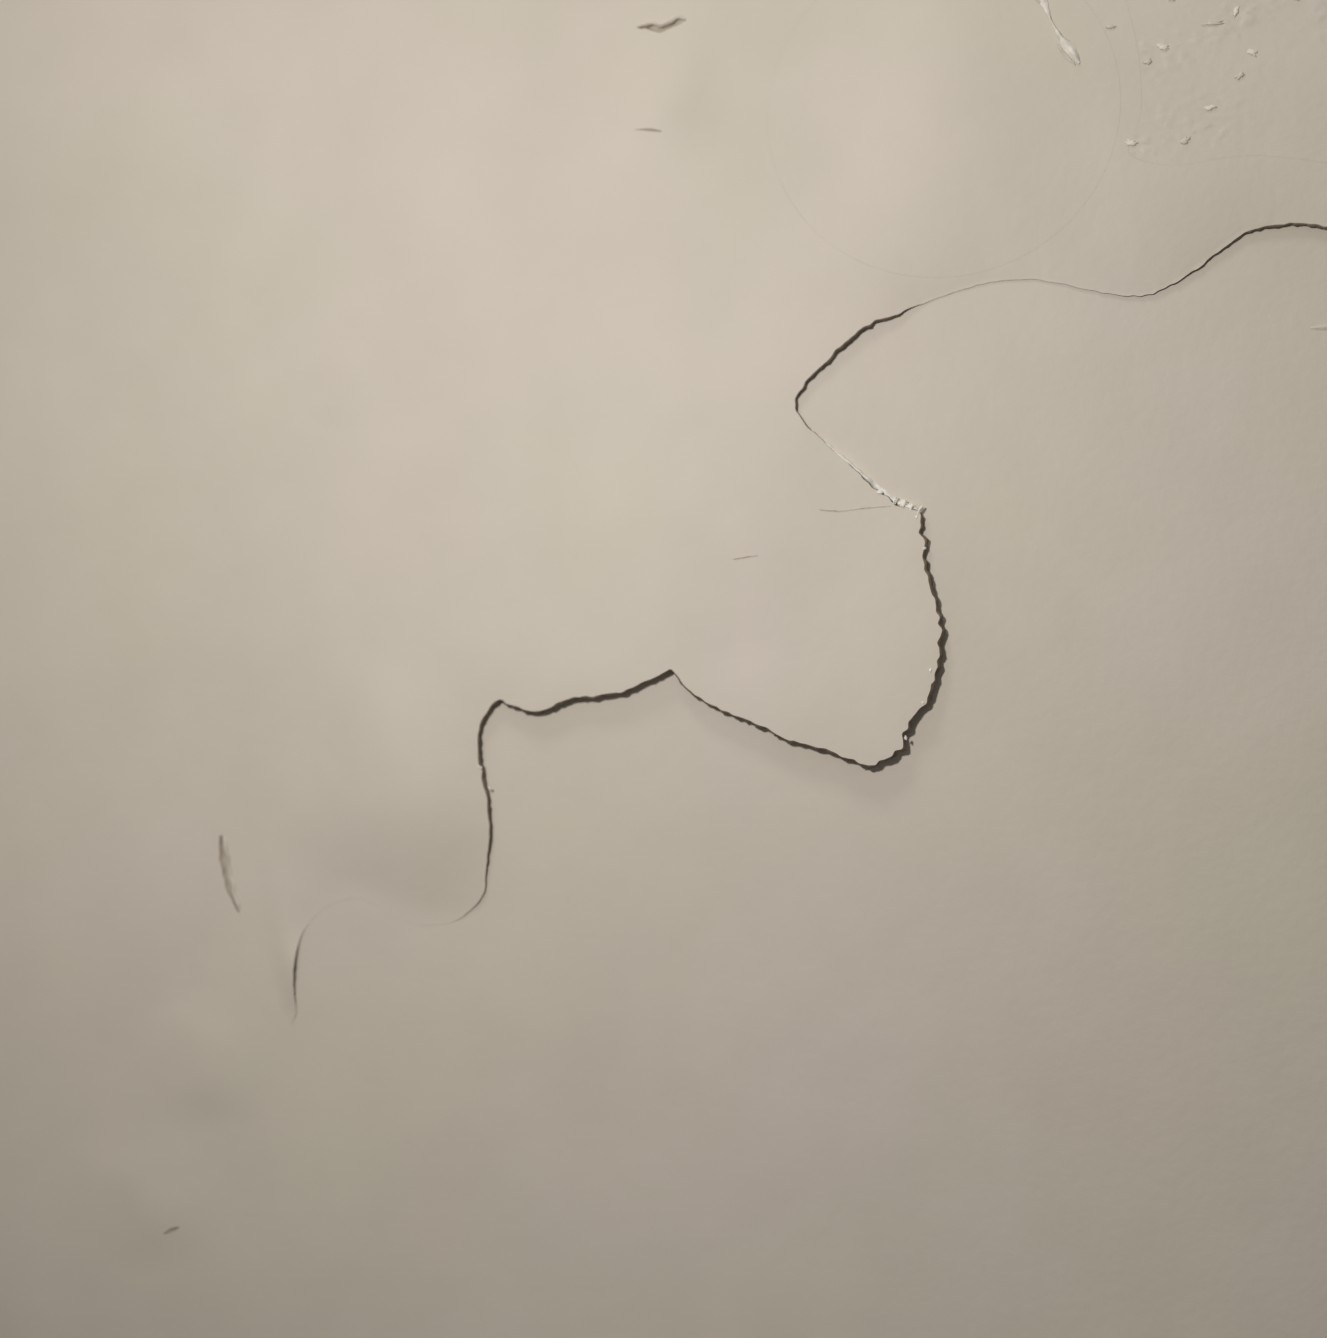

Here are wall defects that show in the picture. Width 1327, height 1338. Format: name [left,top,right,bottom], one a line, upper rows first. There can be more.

crack [637,14,686,33]
flaking render [235,0,1327,1025]
crack [219,835,241,912]